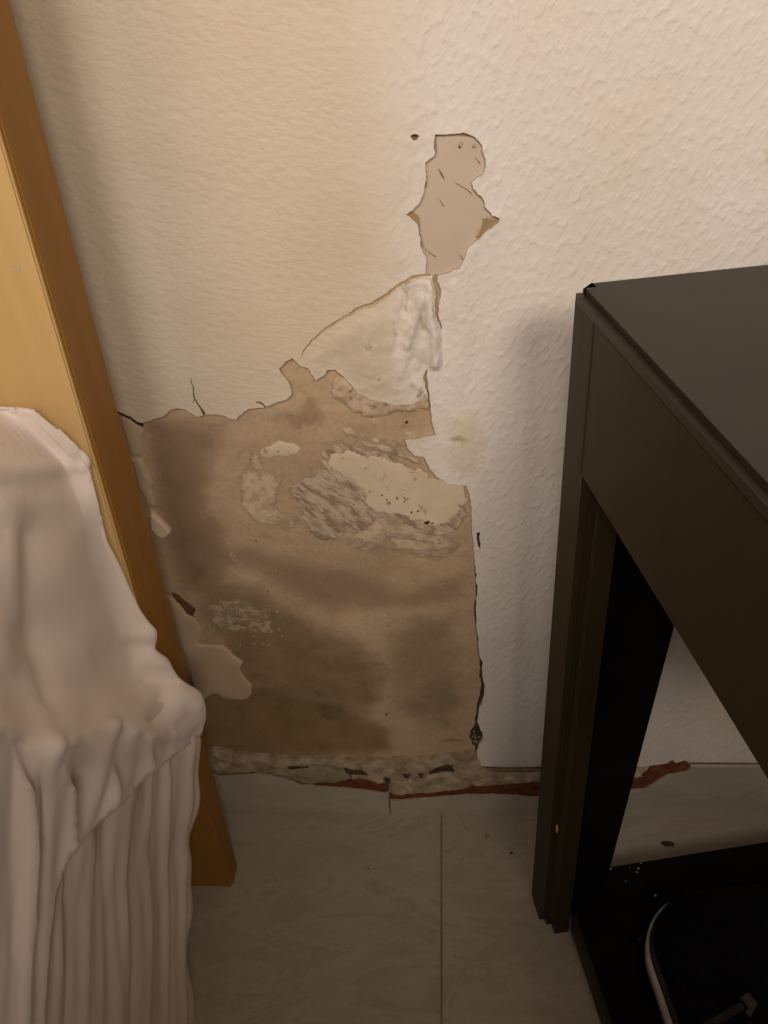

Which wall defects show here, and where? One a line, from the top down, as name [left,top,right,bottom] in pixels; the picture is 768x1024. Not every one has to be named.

peeling [408,133,499,276]
crack [118,412,144,427]
crack [191,382,205,415]
peeling [117,359,541,805]
water stain [202,596,383,753]
spalling [631,760,689,789]